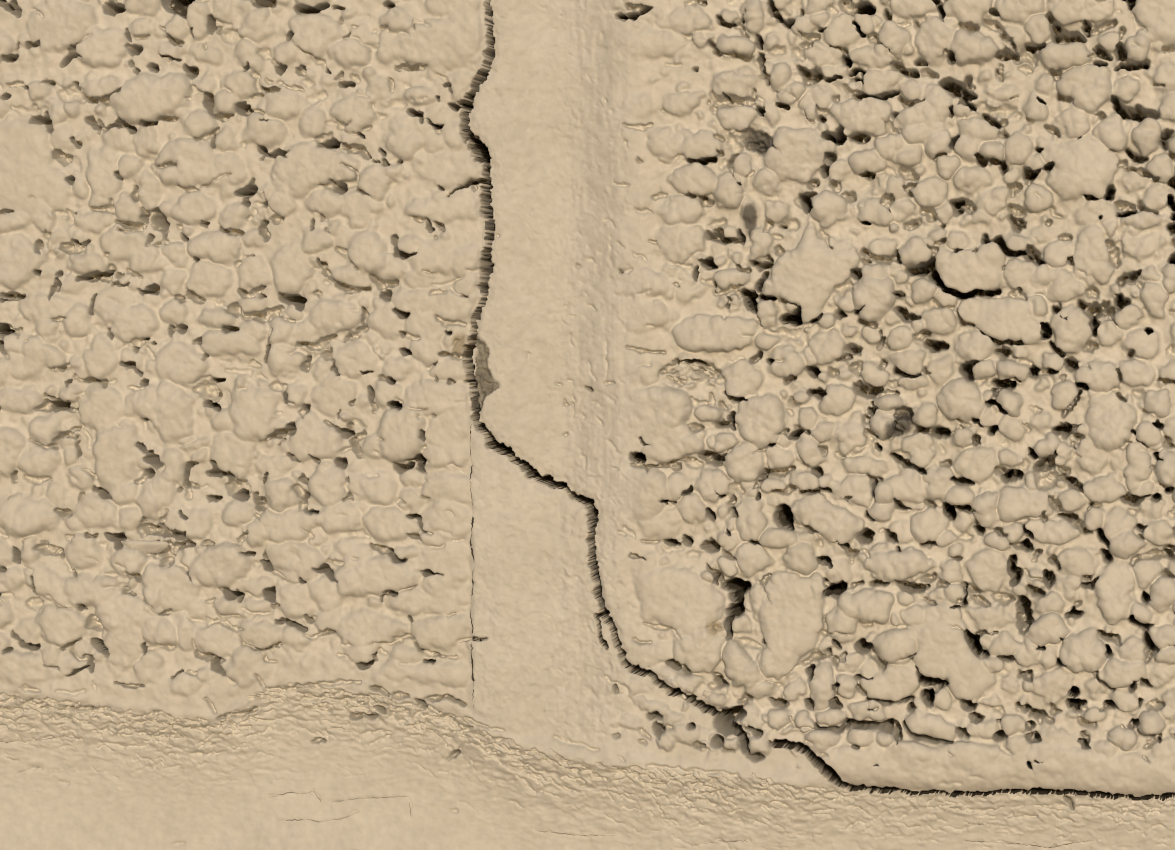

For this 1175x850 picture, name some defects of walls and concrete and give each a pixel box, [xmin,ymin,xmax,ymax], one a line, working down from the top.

crack [456,0,1175,848]